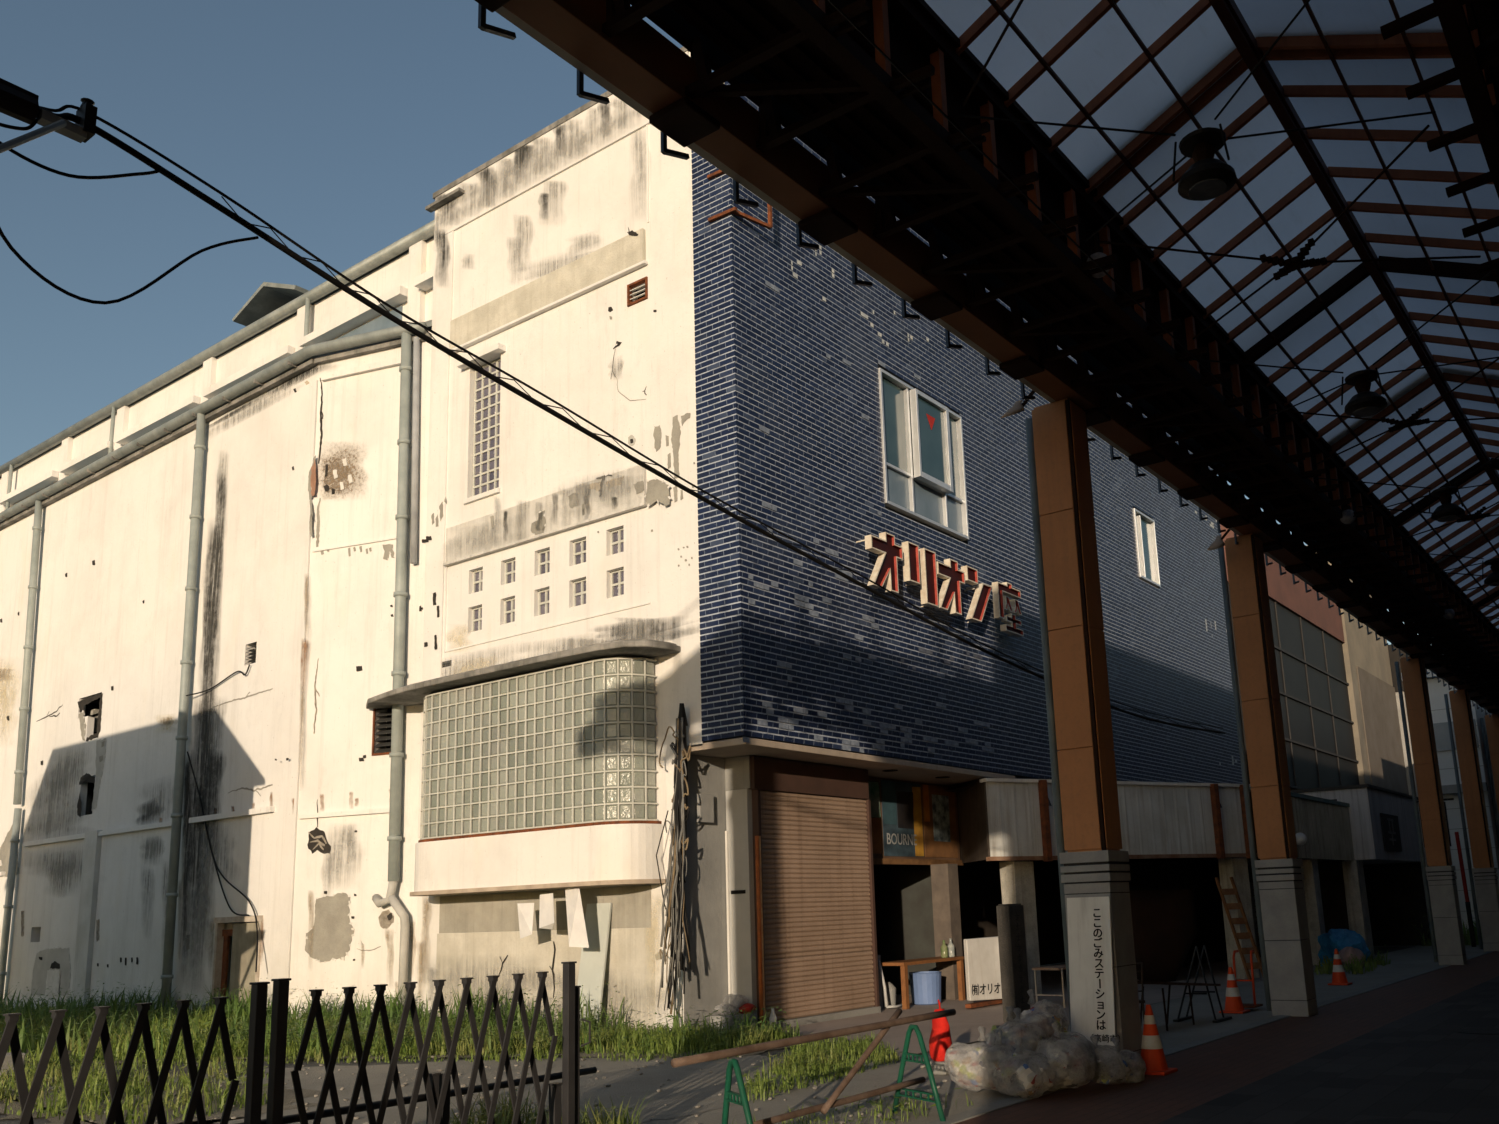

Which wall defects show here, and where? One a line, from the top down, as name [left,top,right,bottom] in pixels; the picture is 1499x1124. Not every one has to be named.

leakage [436,100,638,268]
flaking render [292,449,363,500]
leakage [612,619,675,641]
leakage [145,464,228,947]
flaking render [0,824,19,877]
leakage [141,790,165,821]
spalling [307,799,331,854]
flaking render [304,891,356,963]
flaking render [30,946,71,997]